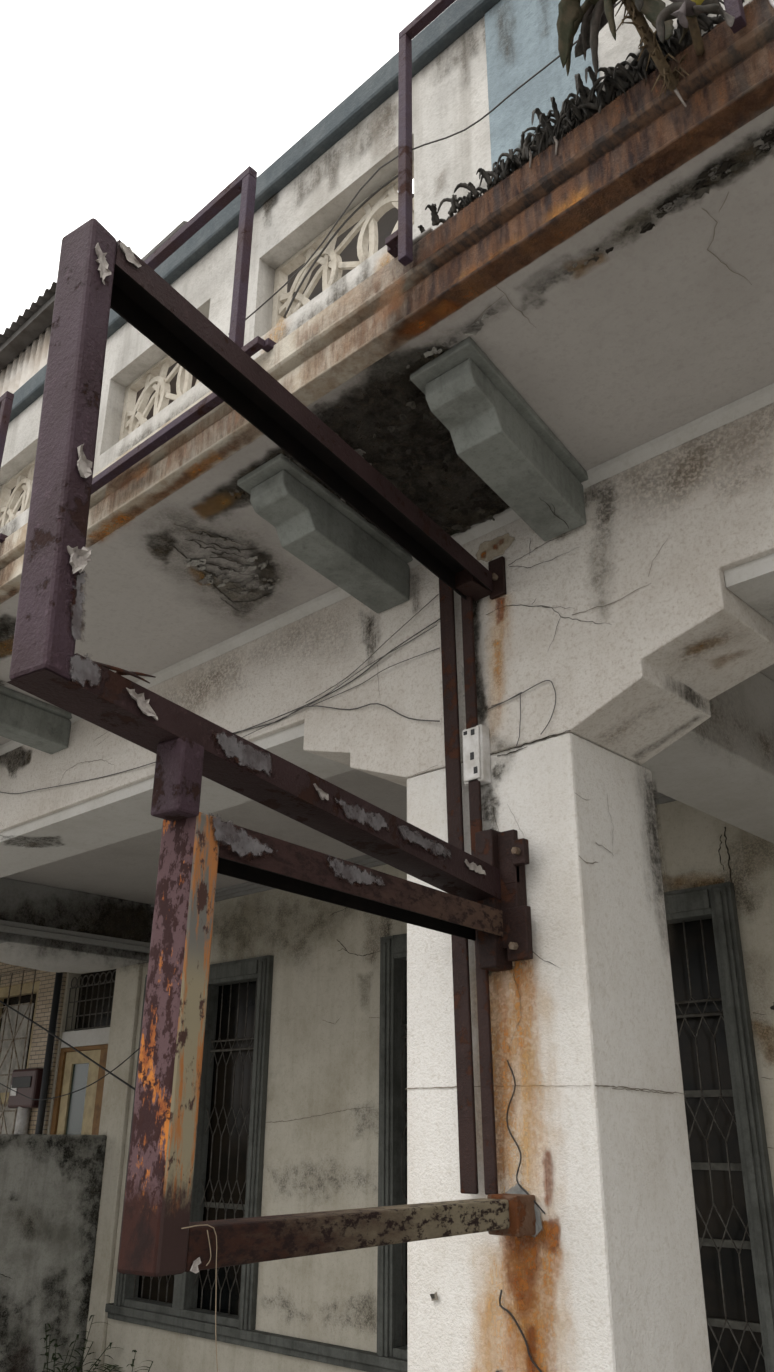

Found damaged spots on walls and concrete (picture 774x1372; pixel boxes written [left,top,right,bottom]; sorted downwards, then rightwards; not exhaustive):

rust [358,0,774,343]
peeling [148,449,392,614]
crack [486,500,667,650]
damp [0,1133,104,1245]
rust [486,960,560,1372]
damp [0,1296,34,1372]
damp [43,1273,93,1344]